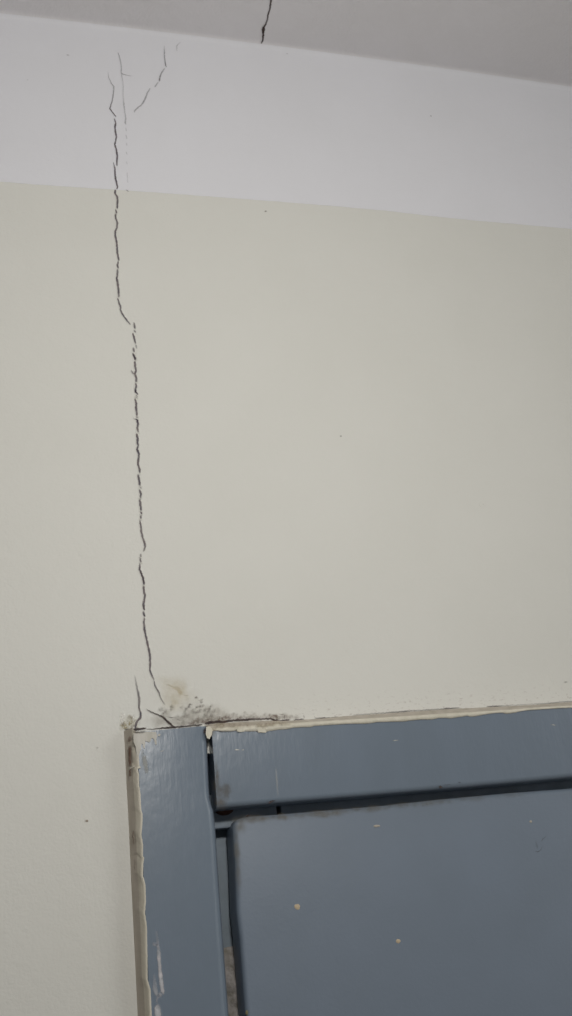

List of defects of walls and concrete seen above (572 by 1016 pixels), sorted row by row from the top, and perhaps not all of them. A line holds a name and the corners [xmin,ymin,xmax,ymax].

crack [261,0,272,44]
crack [109,106,175,728]